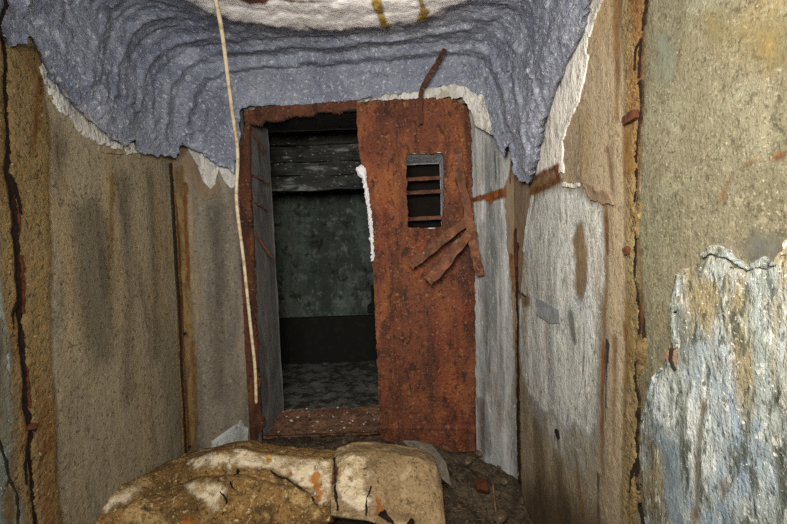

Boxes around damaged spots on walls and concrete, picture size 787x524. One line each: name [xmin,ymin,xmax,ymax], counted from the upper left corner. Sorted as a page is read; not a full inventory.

flaking render [39,63,142,158]
flaking render [361,83,492,135]
peeling [187,147,236,189]
corrosion [473,187,506,204]
corrosion [530,164,561,194]
crack [0,0,39,524]
crack [629,0,649,524]
peeling [639,239,787,524]